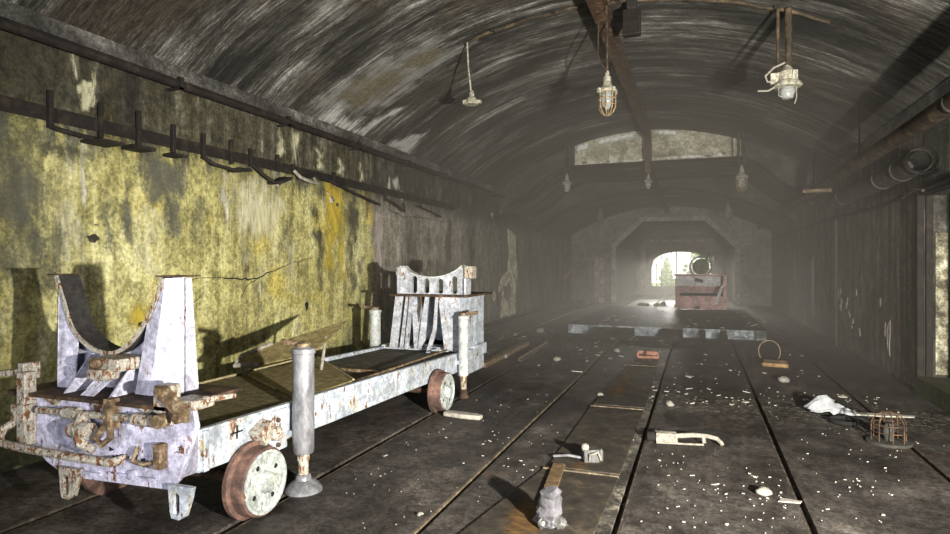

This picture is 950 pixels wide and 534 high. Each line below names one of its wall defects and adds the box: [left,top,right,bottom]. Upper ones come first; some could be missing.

damp [0,122,91,291]
damp [121,186,132,242]
damp [139,143,188,236]
crack [192,258,311,303]
damp [221,184,284,234]
damp [312,210,324,289]
damp [345,204,365,307]
damp [375,212,383,274]